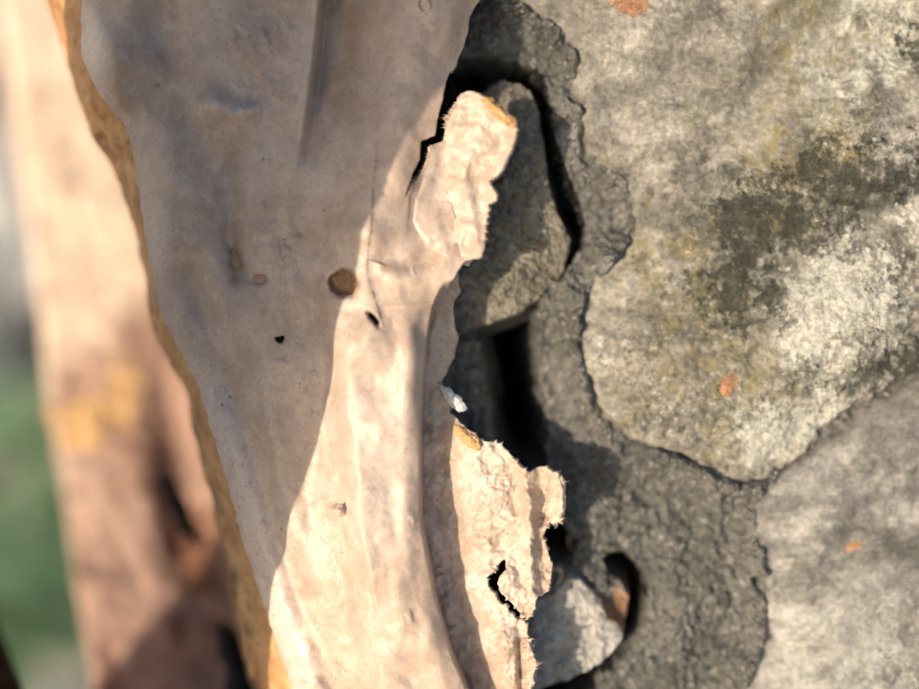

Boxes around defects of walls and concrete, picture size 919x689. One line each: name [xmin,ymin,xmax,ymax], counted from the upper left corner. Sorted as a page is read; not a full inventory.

peeling [410,91,569,689]
crack [488,560,531,628]
spalling [616,550,649,635]